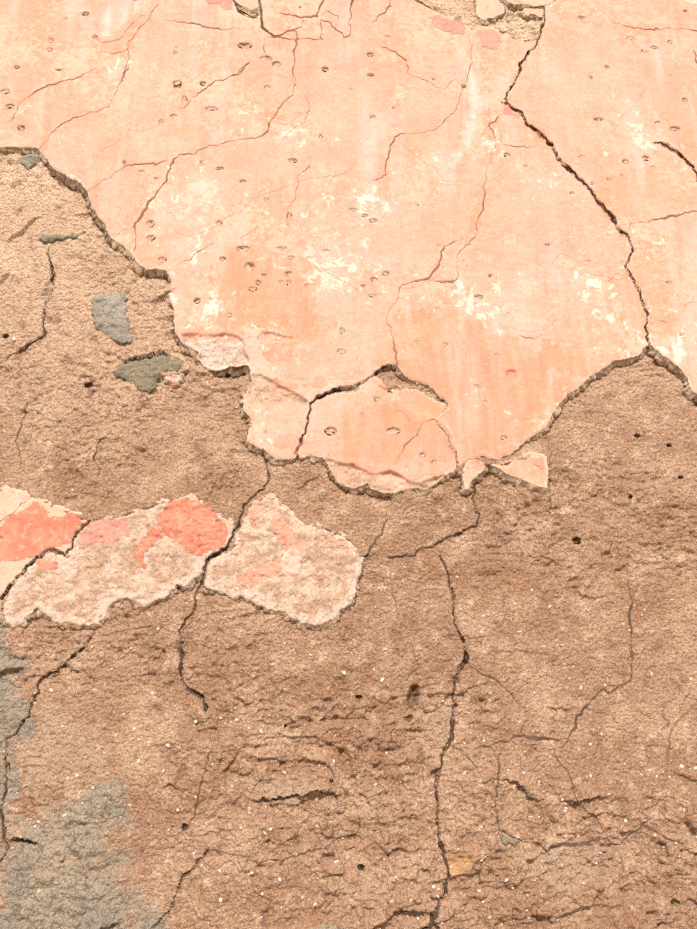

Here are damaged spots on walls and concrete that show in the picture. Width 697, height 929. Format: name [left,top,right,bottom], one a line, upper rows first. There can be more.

crack [13,249,55,354]
crack [39,0,354,251]
peeling [0,0,697,498]
crack [296,5,697,465]
crack [1,522,89,597]
spalling [0,522,367,632]
crack [178,454,270,710]
crack [0,640,89,861]
spalling [403,683,420,722]
crack [360,483,697,929]
crack [139,801,361,927]
spalling [448,854,476,876]